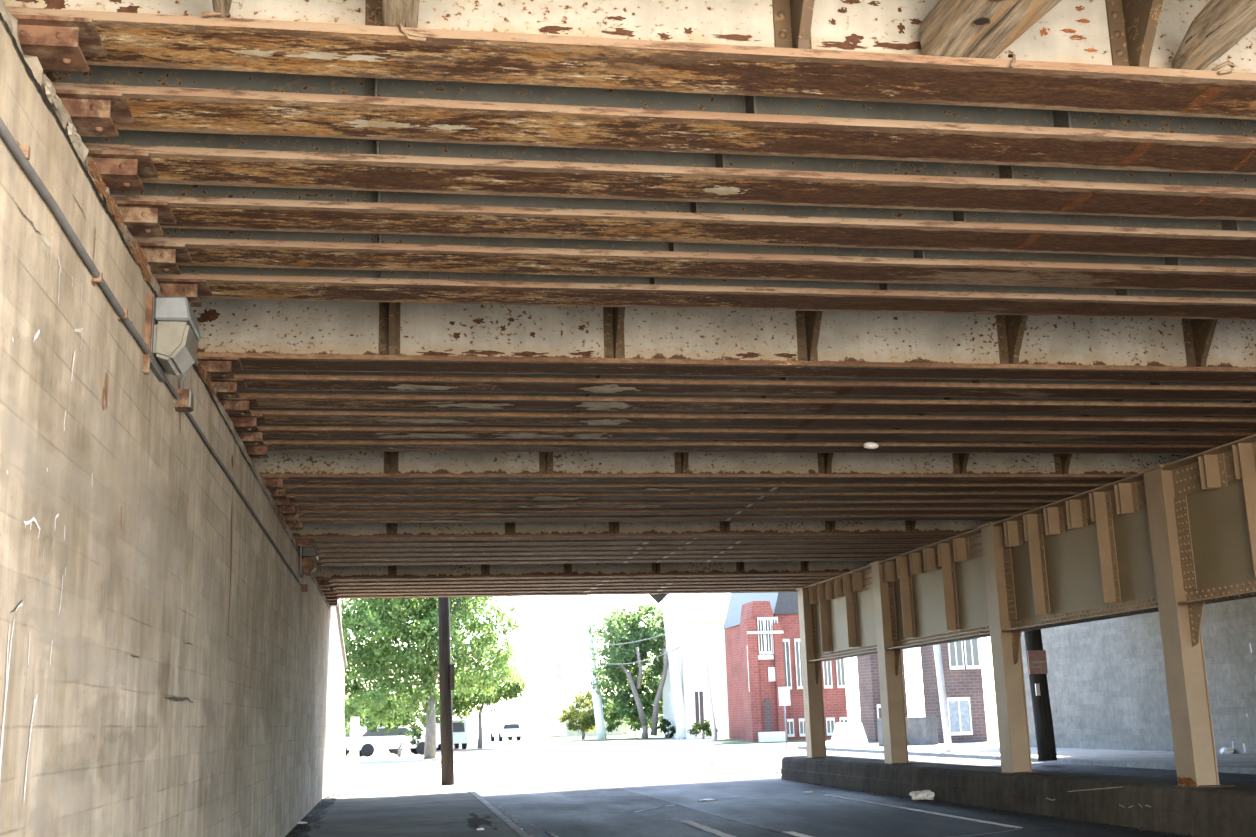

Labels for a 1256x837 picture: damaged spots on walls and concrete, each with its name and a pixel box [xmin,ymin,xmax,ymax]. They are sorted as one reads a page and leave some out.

peeling [829,0,880,25]
peeling [539,26,573,34]
peeling [602,16,637,37]
peeling [821,7,922,50]